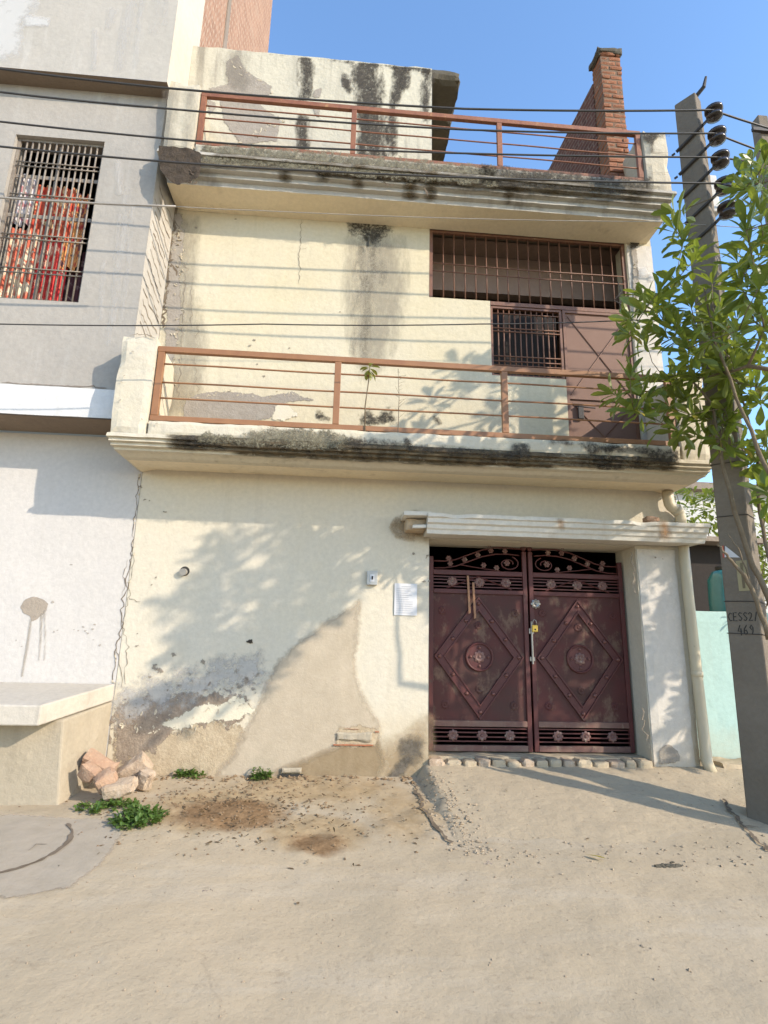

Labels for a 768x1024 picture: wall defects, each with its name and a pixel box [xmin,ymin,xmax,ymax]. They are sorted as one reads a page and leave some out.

peeling [208,55,285,144]
damp [280,57,652,203]
spalling [158,146,201,185]
damp [347,223,391,243]
peeling [183,390,313,421]
damp [169,435,681,471]
crack [111,474,141,688]
peeling [109,658,264,776]
crack [722,798,768,850]